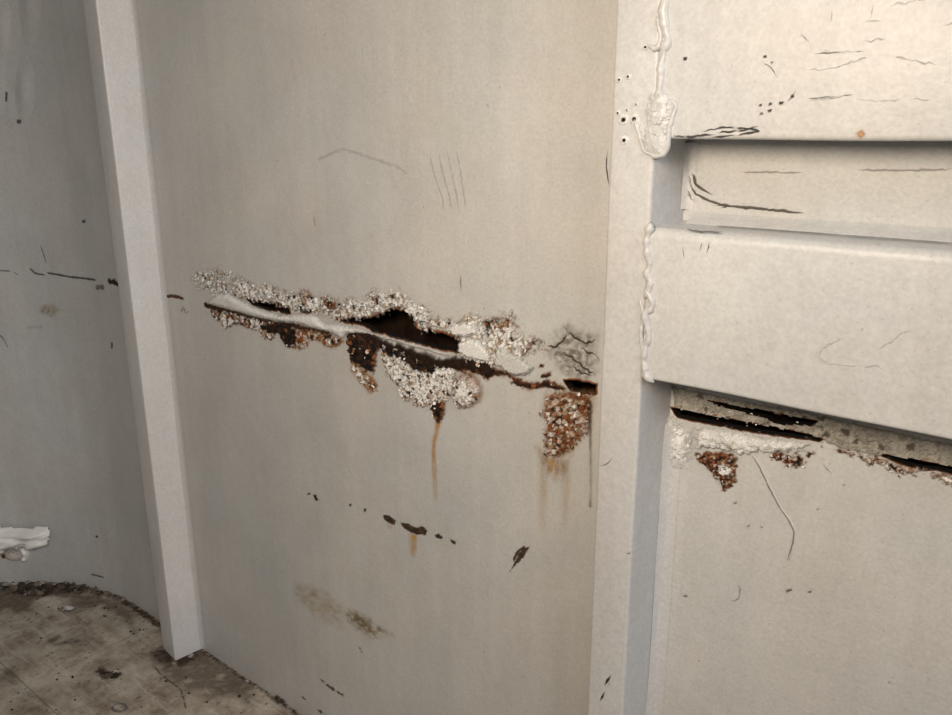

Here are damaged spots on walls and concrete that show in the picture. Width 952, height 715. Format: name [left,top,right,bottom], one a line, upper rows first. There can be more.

corrosion [204,303,493,391]
peeling [191,267,544,375]
peeling [379,345,456,408]
spalling [570,380,596,392]
corrosion [430,401,445,461]
corrosion [539,389,592,474]
crack [752,455,796,560]